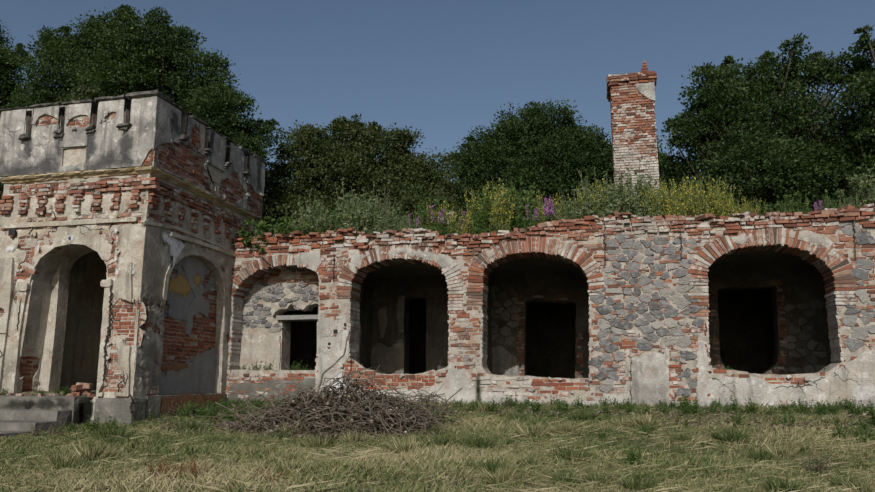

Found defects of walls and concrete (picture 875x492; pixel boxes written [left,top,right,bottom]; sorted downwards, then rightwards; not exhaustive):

spalling [143,122,264,218]
crack [201,164,256,192]
spalling [19,356,39,392]
spalling [100,270,217,393]